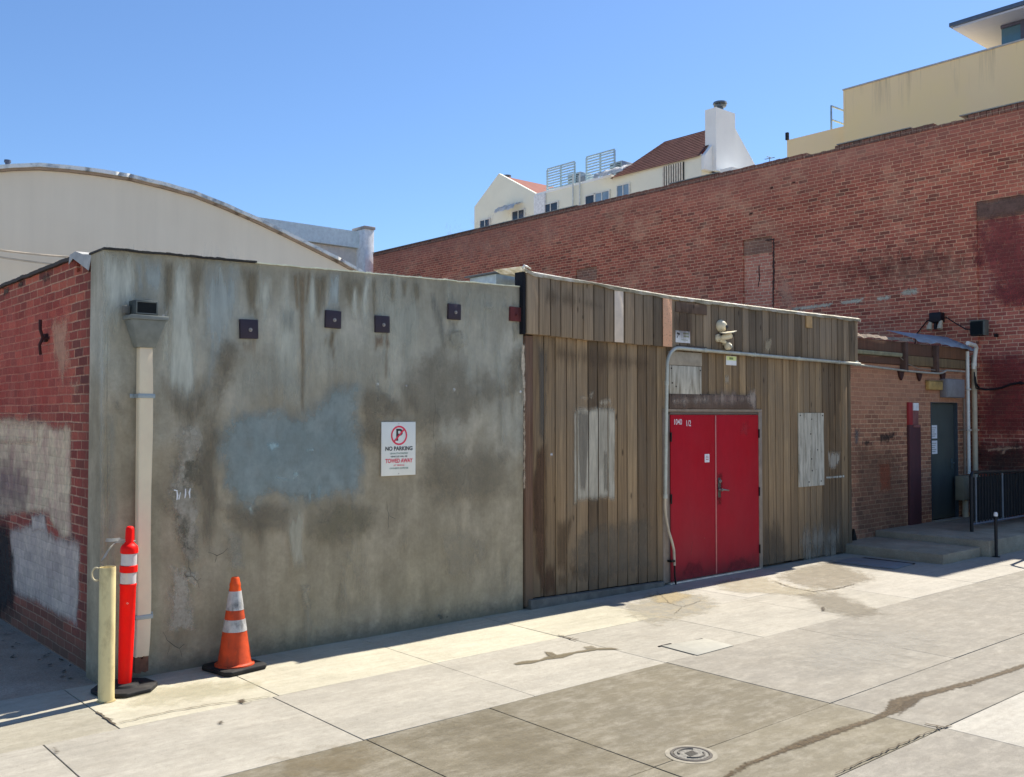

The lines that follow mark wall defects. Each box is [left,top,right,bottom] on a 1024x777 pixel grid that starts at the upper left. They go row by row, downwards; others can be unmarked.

leakage [105,255,134,310]
leakage [148,265,201,399]
leakage [290,277,418,354]